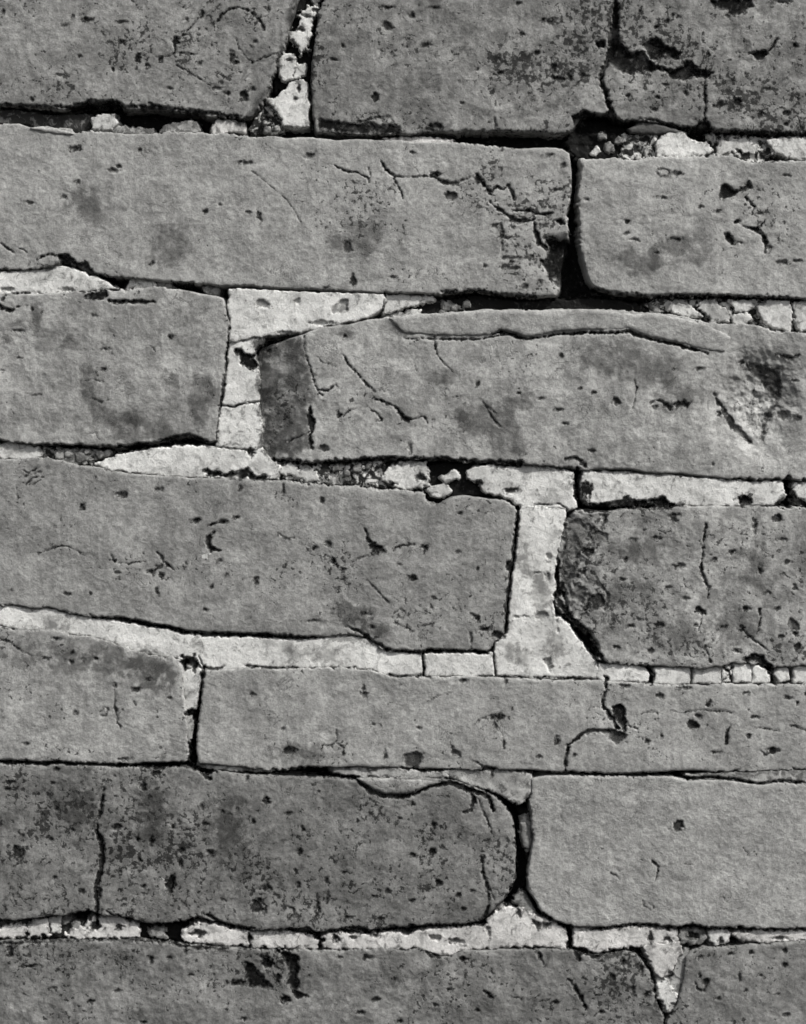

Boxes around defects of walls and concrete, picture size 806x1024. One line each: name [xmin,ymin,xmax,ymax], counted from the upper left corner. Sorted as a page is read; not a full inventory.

crack [334,160,553,251]
crack [285,335,428,450]
crack [406,329,709,373]
crack [345,466,796,784]
crack [92,616,322,924]
crack [238,732,574,950]
crack [201,911,255,930]